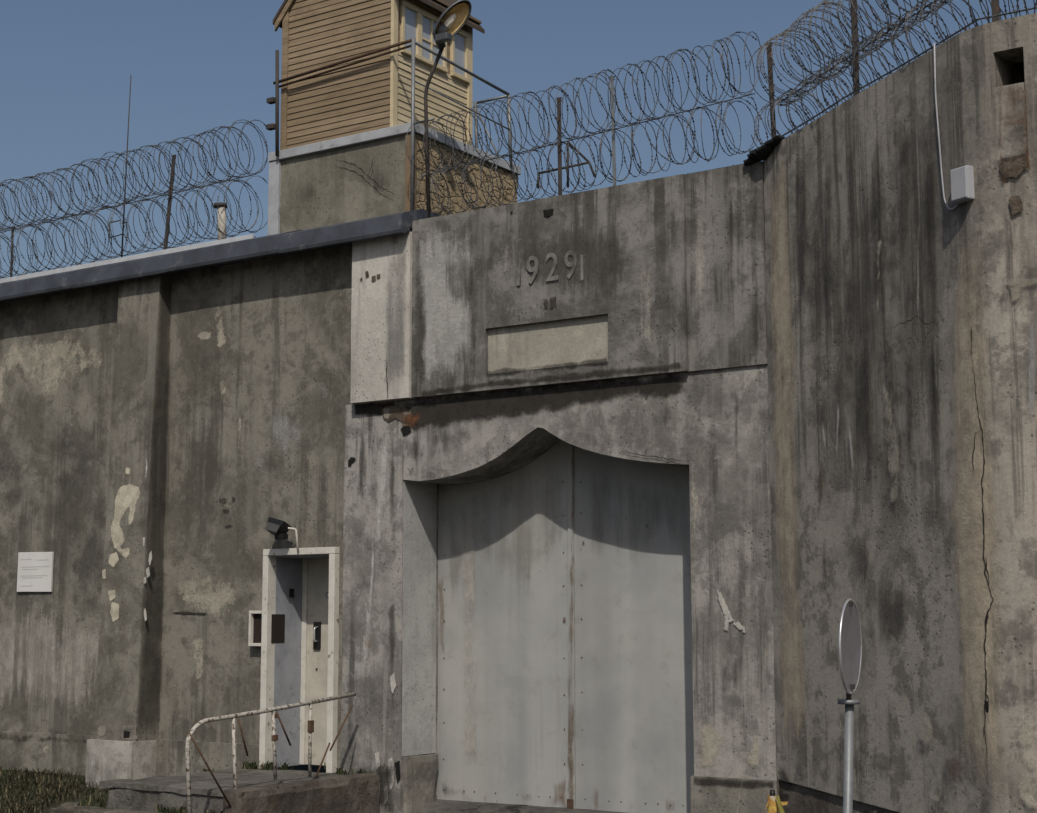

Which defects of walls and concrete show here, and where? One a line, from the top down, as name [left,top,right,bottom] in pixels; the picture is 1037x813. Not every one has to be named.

crack [339,154,395,195]
spalling [999,153,1028,179]
spalling [1008,195,1023,215]
water stain [0,340,101,403]
flaking render [102,459,148,579]
water stain [952,249,997,763]
crack [971,324,994,787]
flaking render [108,589,119,622]
water stain [180,577,235,616]
water stain [0,617,98,700]